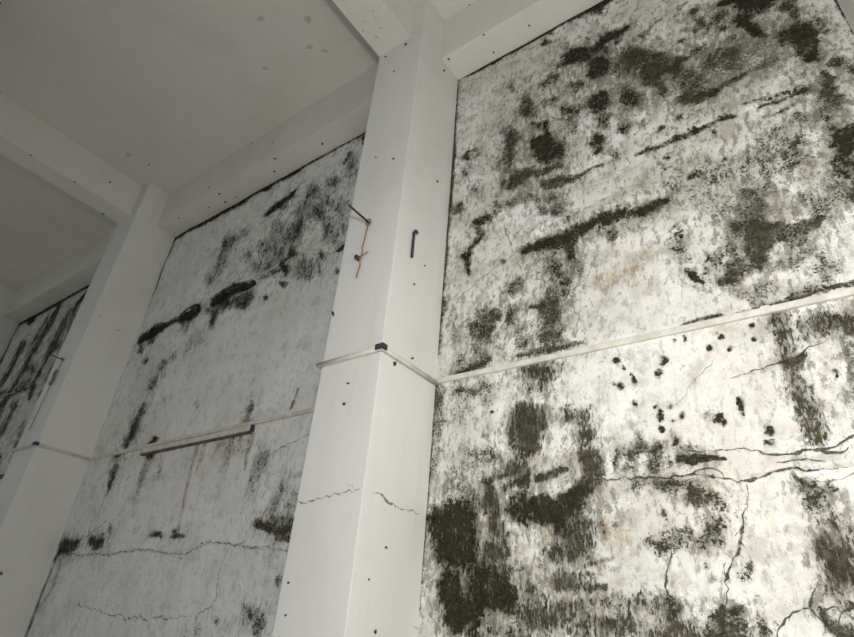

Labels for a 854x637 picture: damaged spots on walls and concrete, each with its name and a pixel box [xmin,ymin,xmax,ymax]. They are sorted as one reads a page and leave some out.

damp [107,131,366,496]
damp [421,0,854,637]
crack [60,521,287,623]
damp [253,470,297,543]
crack [298,485,416,514]
crack [576,435,854,637]